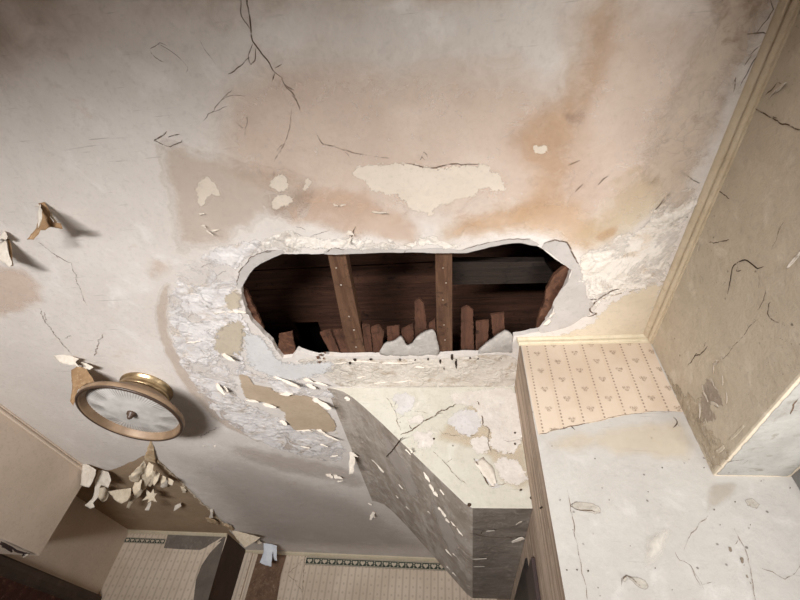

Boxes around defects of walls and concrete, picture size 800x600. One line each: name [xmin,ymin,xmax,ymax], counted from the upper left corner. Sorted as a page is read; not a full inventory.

crack [204,0,300,120]
peeling [0,231,13,267]
peeling [27,202,63,240]
peeling [269,174,293,210]
peeling [211,250,439,457]
peeling [353,162,506,216]
crack [407,152,478,169]
flaking render [324,231,664,336]
spalling [478,330,513,354]
crack [723,259,774,359]
peeling [447,386,529,489]
peeling [76,441,286,600]